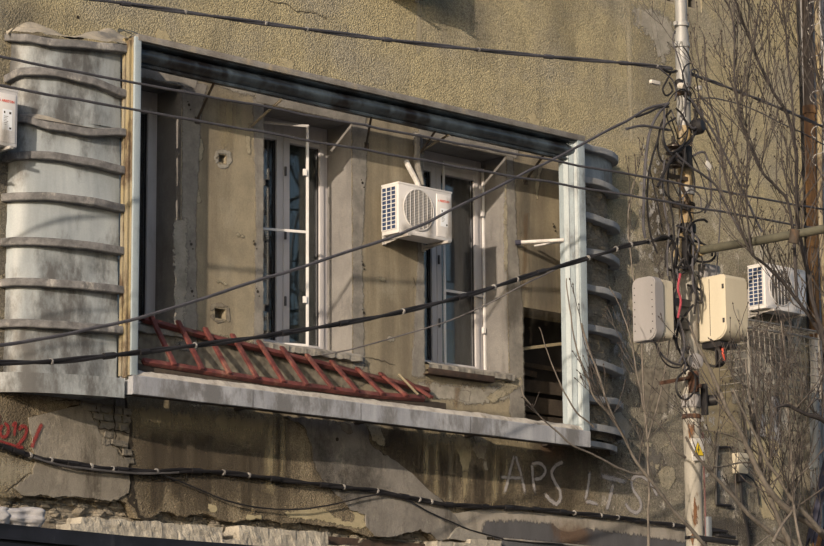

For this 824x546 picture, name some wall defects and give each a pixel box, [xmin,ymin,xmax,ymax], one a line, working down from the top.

rust [803,105,818,239]
spalling [79,398,134,464]
damp [131,402,287,511]
damp [384,428,618,506]
flaking render [0,497,429,545]
rust [691,497,702,546]